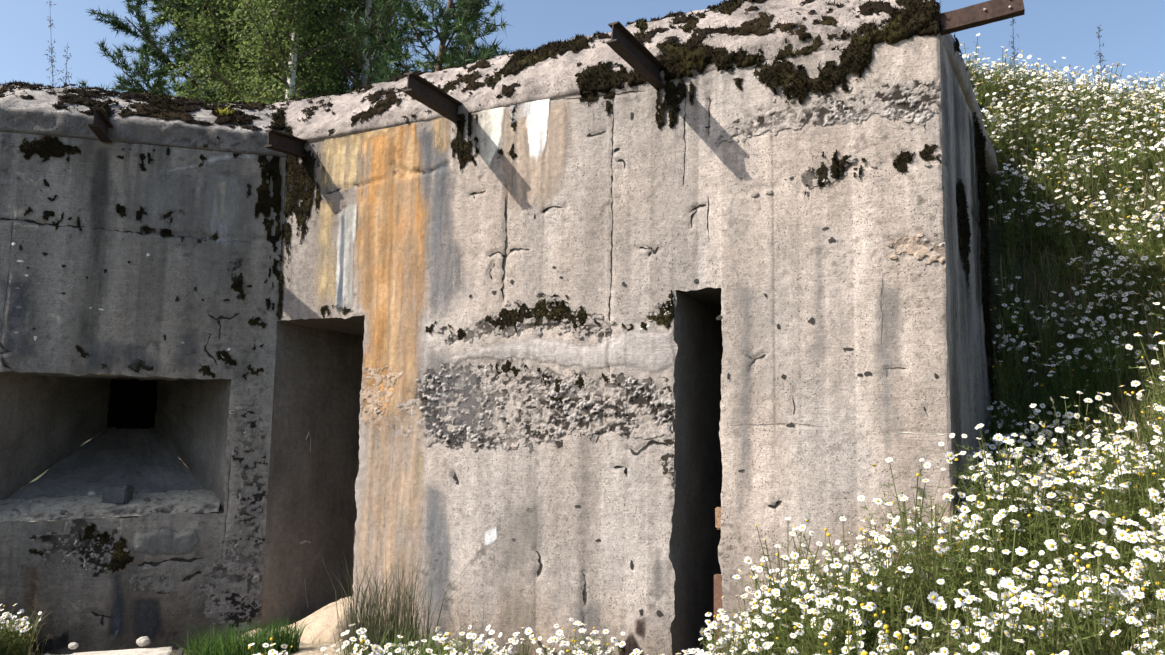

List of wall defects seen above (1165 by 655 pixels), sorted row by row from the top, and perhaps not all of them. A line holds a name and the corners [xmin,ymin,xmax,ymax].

crack [469,187,530,300]
rust [319,123,429,603]
spalling [360,356,675,488]
spalling [430,290,616,345]
spalling [30,518,130,577]
spalling [197,402,269,633]